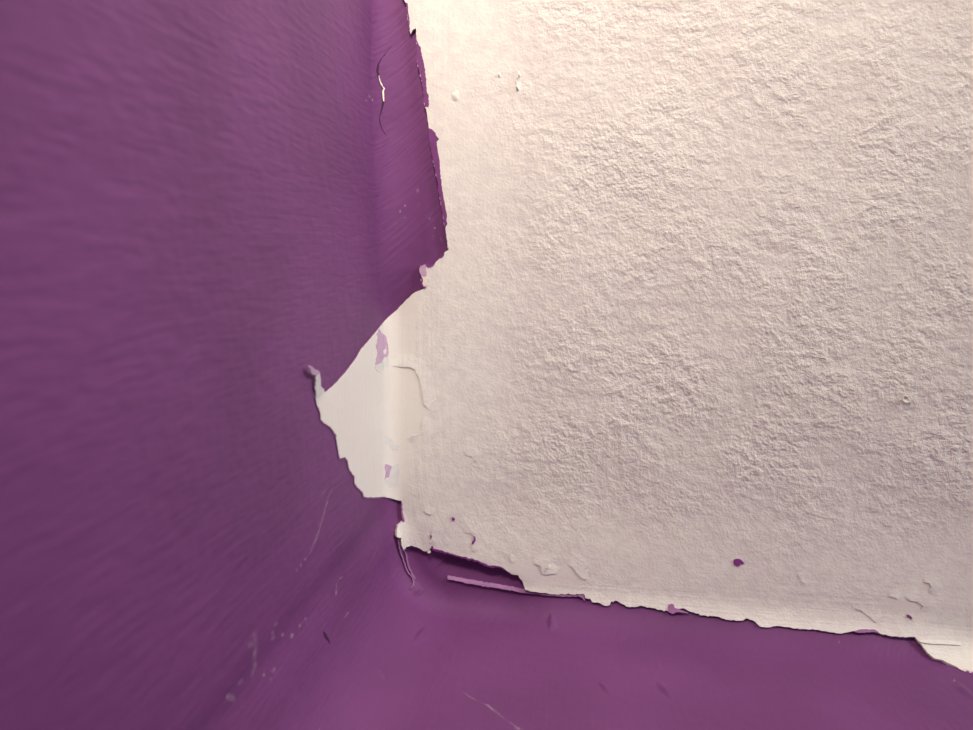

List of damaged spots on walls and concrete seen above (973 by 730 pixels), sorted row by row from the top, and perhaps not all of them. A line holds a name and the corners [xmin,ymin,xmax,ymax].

peeling [416,42,429,107]
peeling [429,128,447,242]
peeling [309,264,441,501]
peeling [510,550,589,587]
peeling [877,572,943,615]
peeling [914,636,973,675]